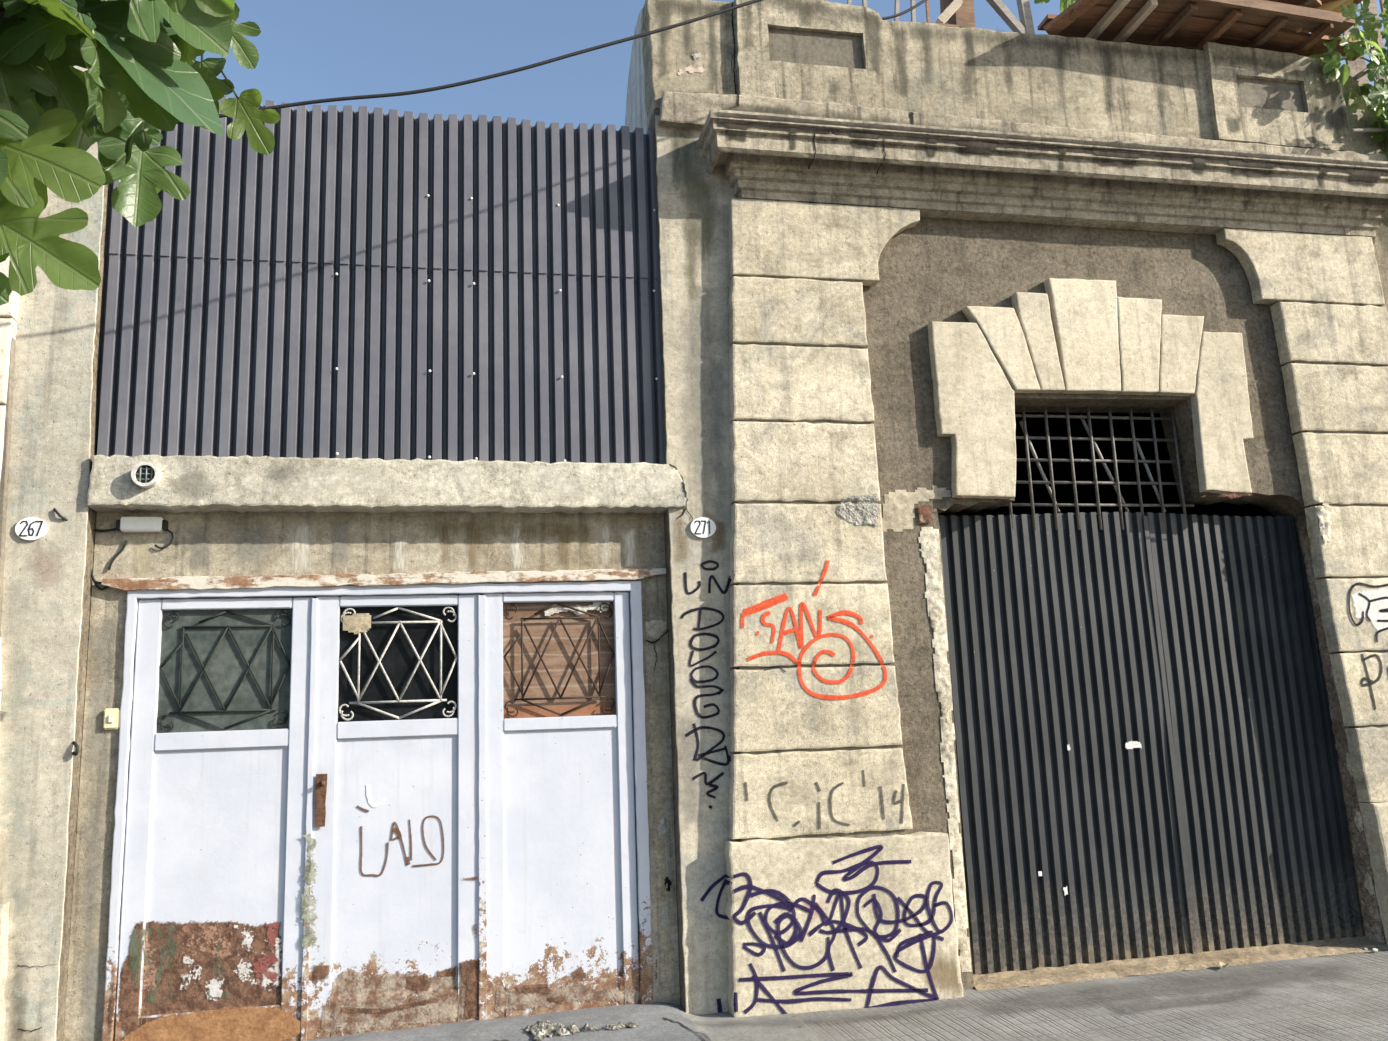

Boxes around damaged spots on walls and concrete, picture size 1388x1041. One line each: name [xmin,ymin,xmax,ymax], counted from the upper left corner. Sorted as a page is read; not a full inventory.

damp [747,0,879,73]
damp [896,29,1175,108]
damp [1213,55,1348,131]
damp [725,105,896,149]
damp [917,123,943,157]
damp [957,128,999,156]
damp [1059,146,1067,169]
damp [1091,148,1143,168]
corrosion [109,920,301,1041]
corrosion [313,946,657,1035]
crack [664,1017,711,1041]